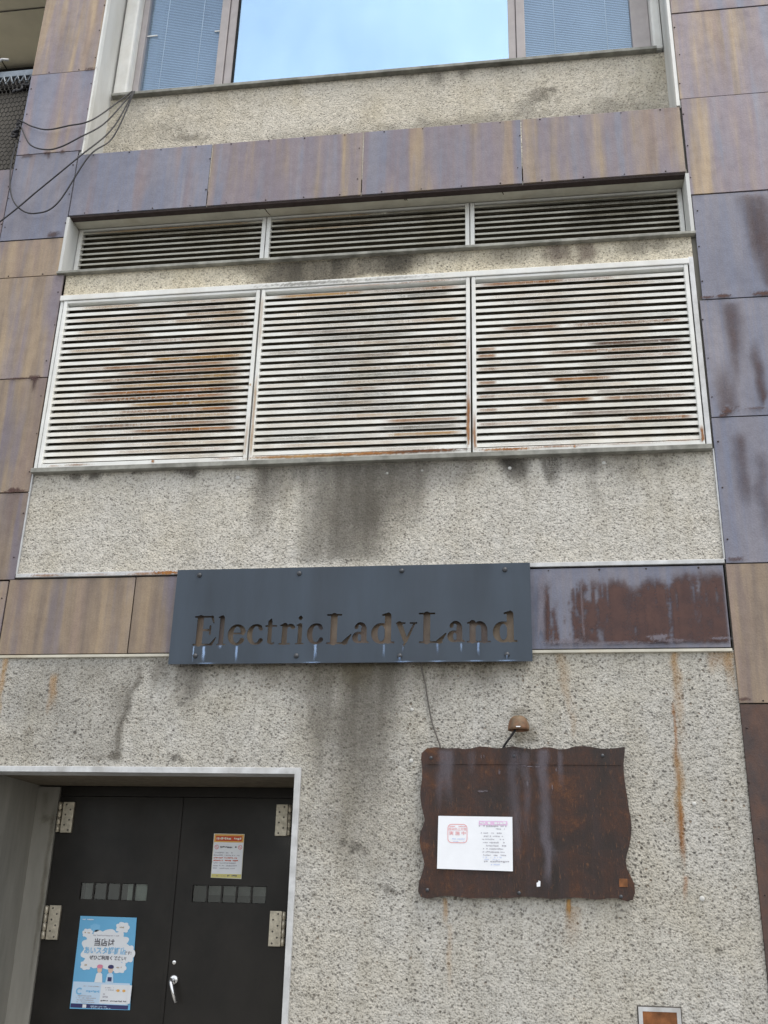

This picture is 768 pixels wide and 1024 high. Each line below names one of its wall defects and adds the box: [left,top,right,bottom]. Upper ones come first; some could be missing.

corrosion [578,338,677,357]
corrosion [90,354,238,432]
corrosion [544,397,595,413]
corrosion [608,395,688,420]
corrosion [544,588,559,644]
corrosion [572,574,728,644]